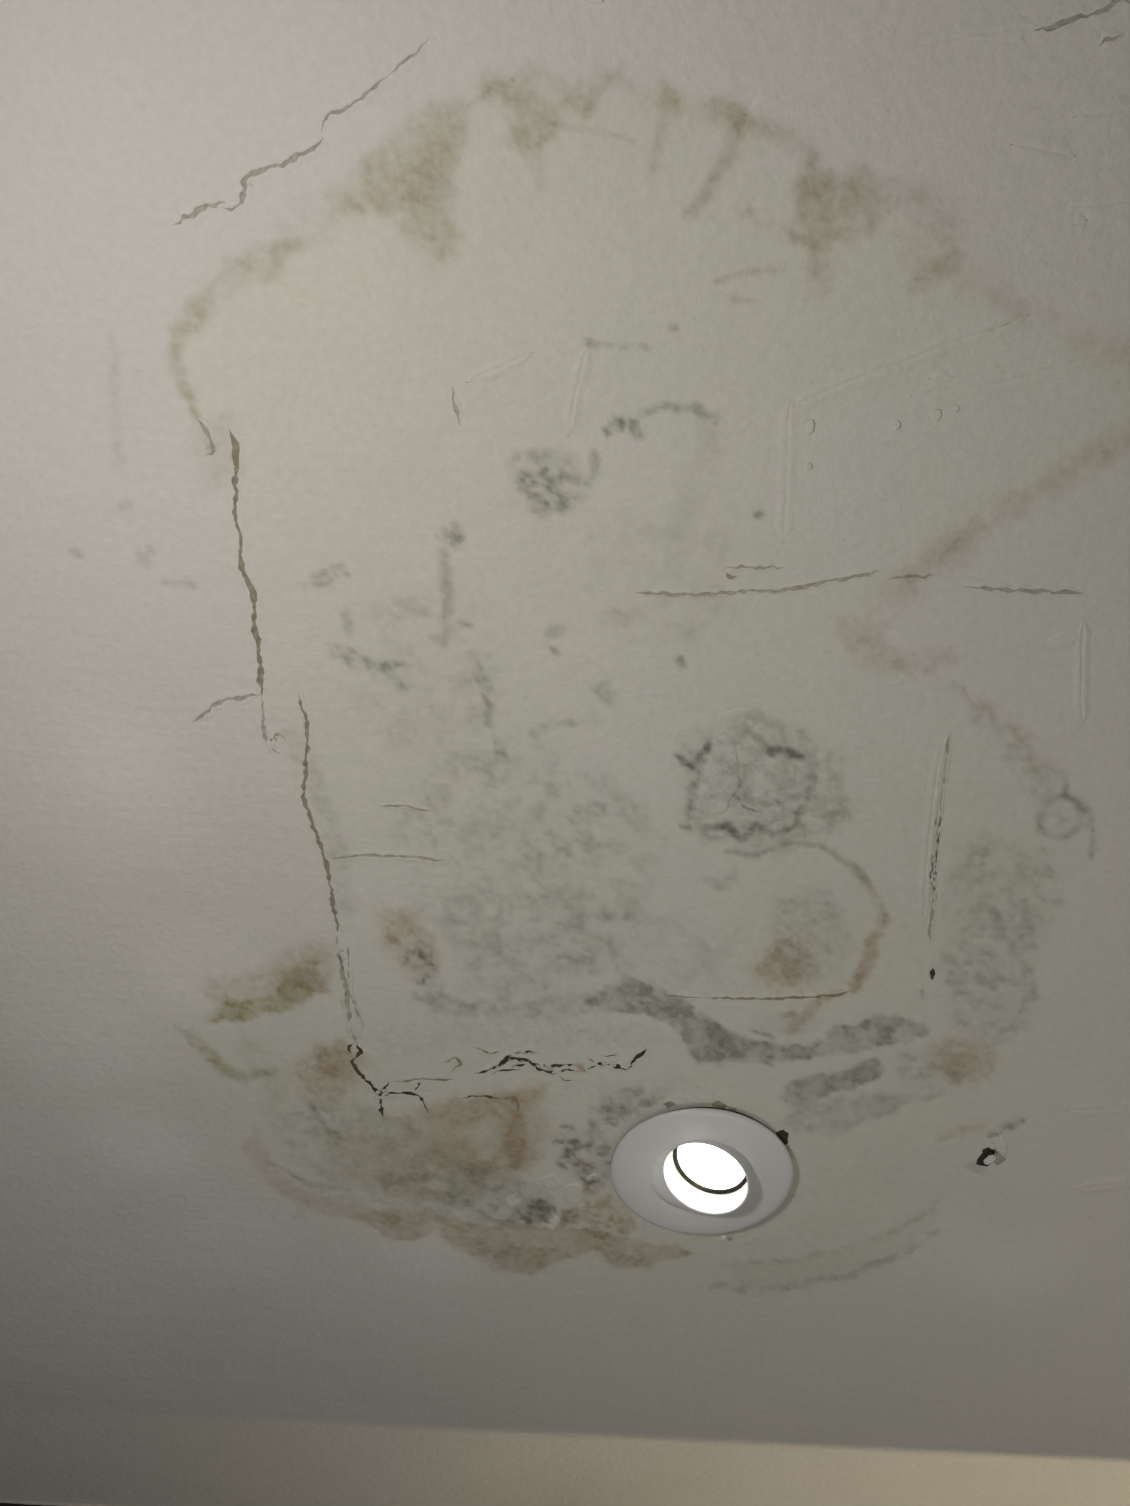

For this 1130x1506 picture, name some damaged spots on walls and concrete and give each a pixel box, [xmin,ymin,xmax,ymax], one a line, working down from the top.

crack [171,37,429,228]
crack [192,417,649,1118]